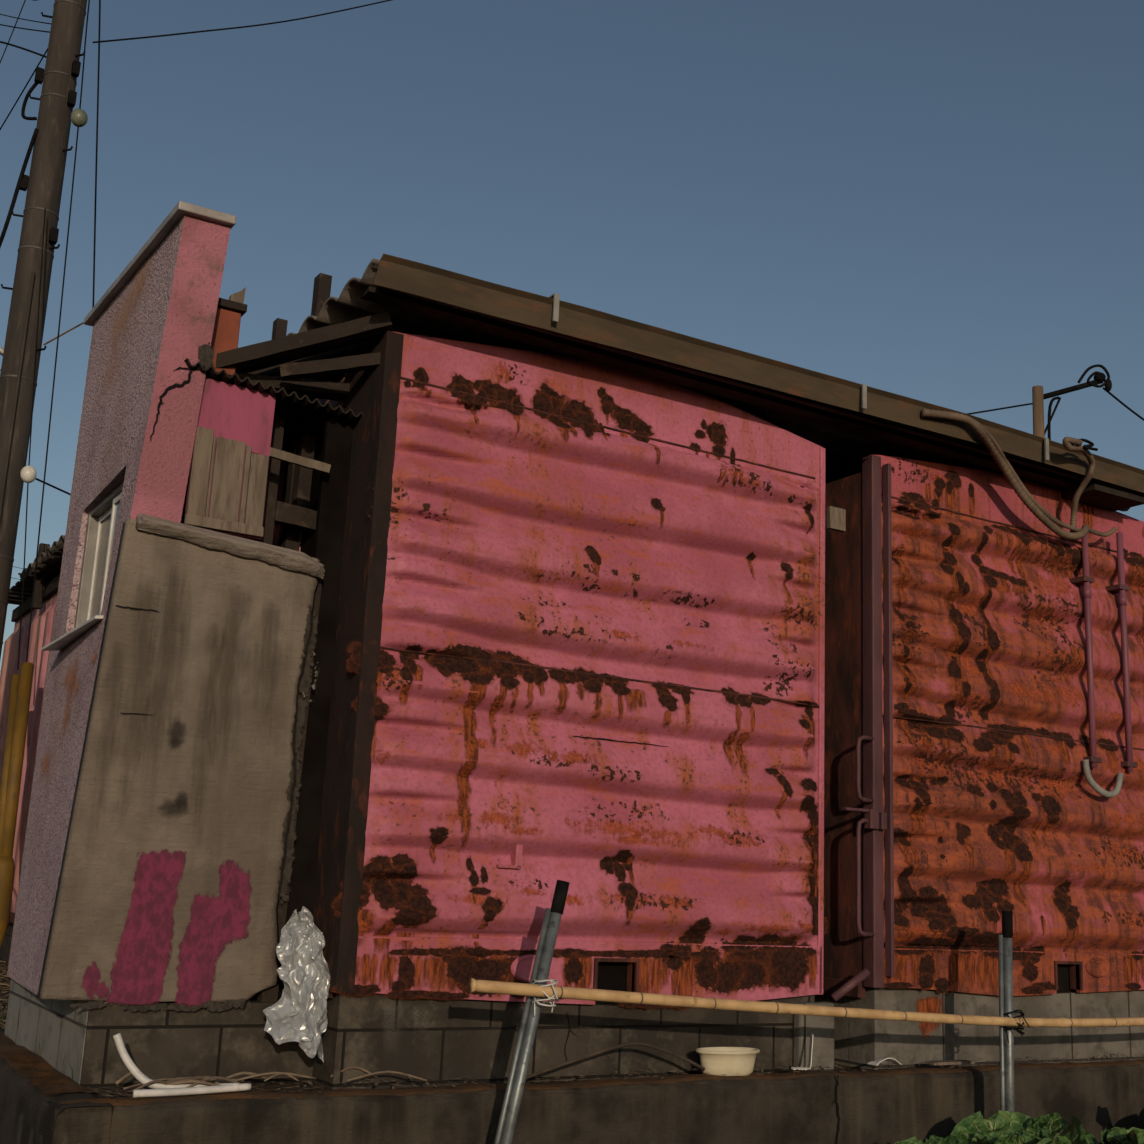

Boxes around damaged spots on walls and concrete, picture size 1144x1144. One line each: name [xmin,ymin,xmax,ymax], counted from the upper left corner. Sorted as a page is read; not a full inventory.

crack [150,366,205,441]
rust [404,367,432,397]
rust [446,362,661,464]
rust [690,419,770,488]
damp [171,722,184,747]
rust [721,686,770,771]
rust [794,701,819,757]
rust [883,458,1144,1037]
damp [163,794,186,814]
rust [334,643,694,1000]
rust [545,768,827,1009]